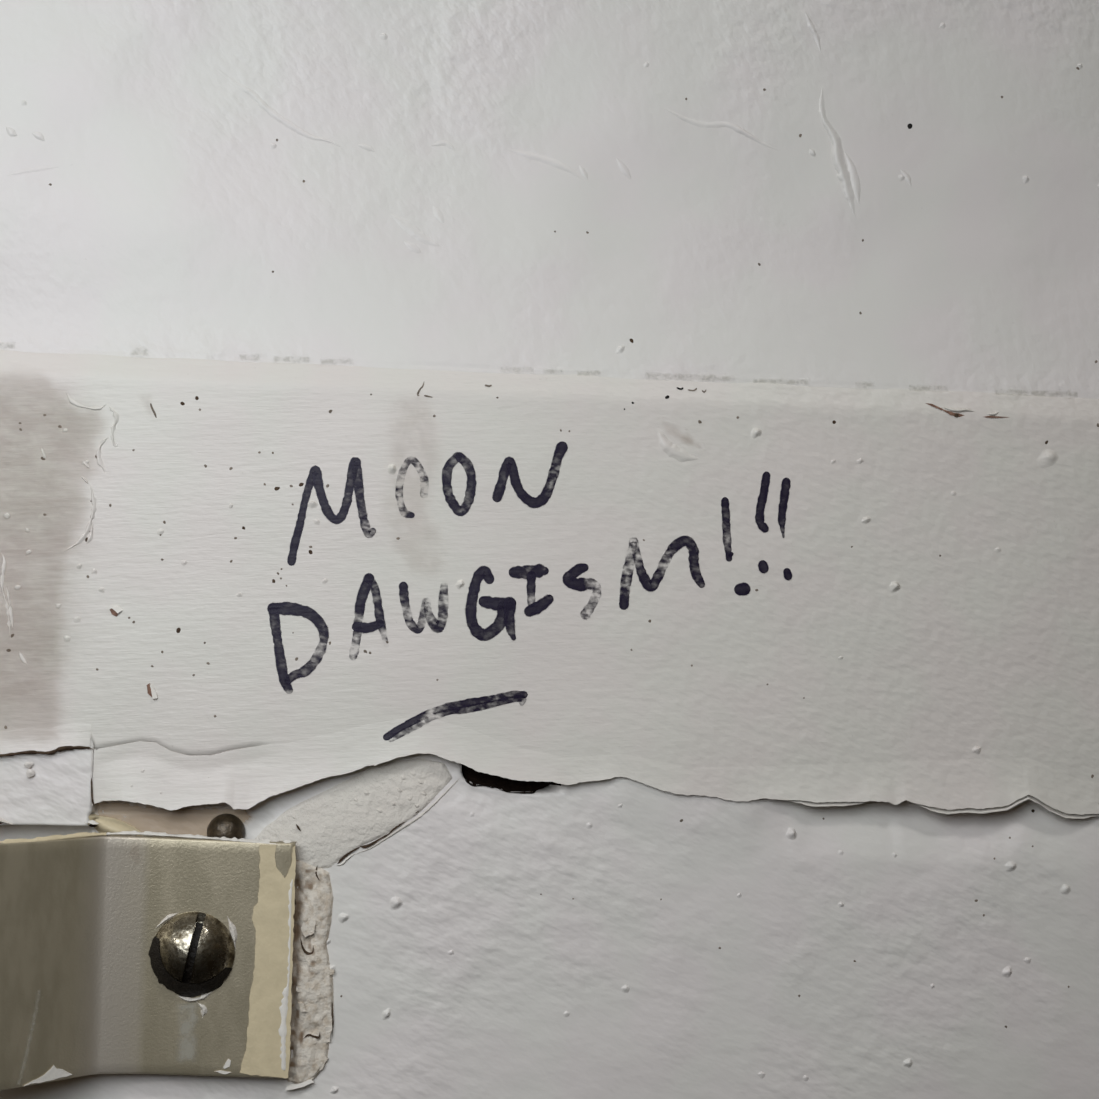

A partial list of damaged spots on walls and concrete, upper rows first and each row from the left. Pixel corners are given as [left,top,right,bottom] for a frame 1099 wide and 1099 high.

peeling [0,717,1099,1090]